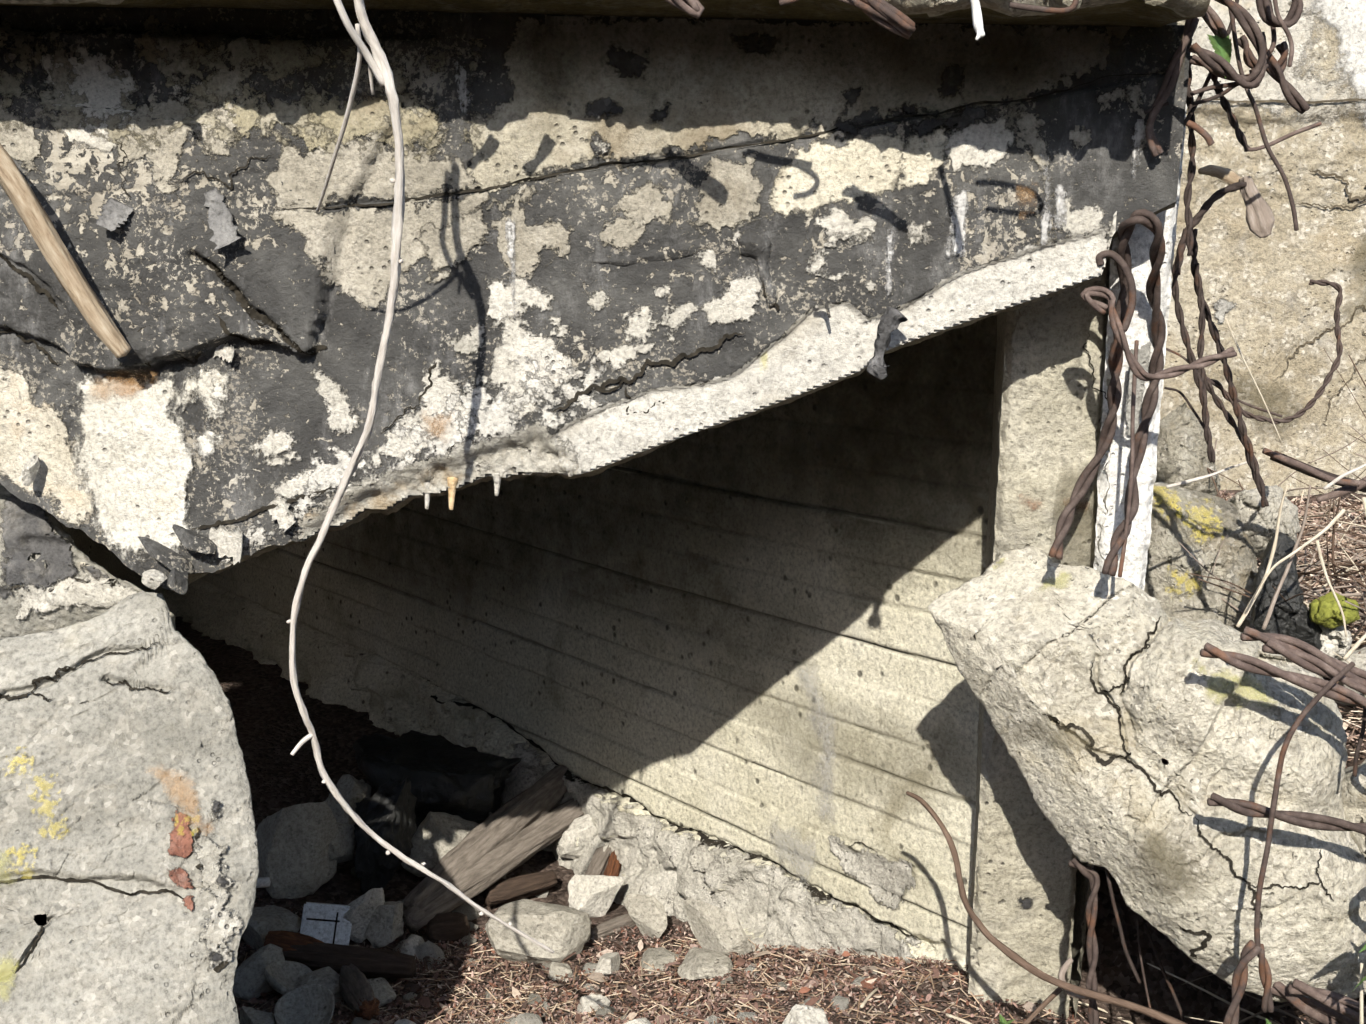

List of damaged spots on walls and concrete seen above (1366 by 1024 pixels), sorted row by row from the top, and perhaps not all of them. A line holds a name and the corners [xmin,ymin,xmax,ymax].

crack [281,71,1164,209]
peeling [1096,79,1148,151]
crack [1295,169,1366,209]
crack [0,254,59,310]
crack [0,328,61,365]
crack [115,256,327,368]
peeling [0,15,1130,565]
flaking render [1125,342,1151,435]
crack [1270,304,1366,429]
crack [1042,616,1334,927]
spalling [501,742,922,963]
crack [1180,926,1212,958]